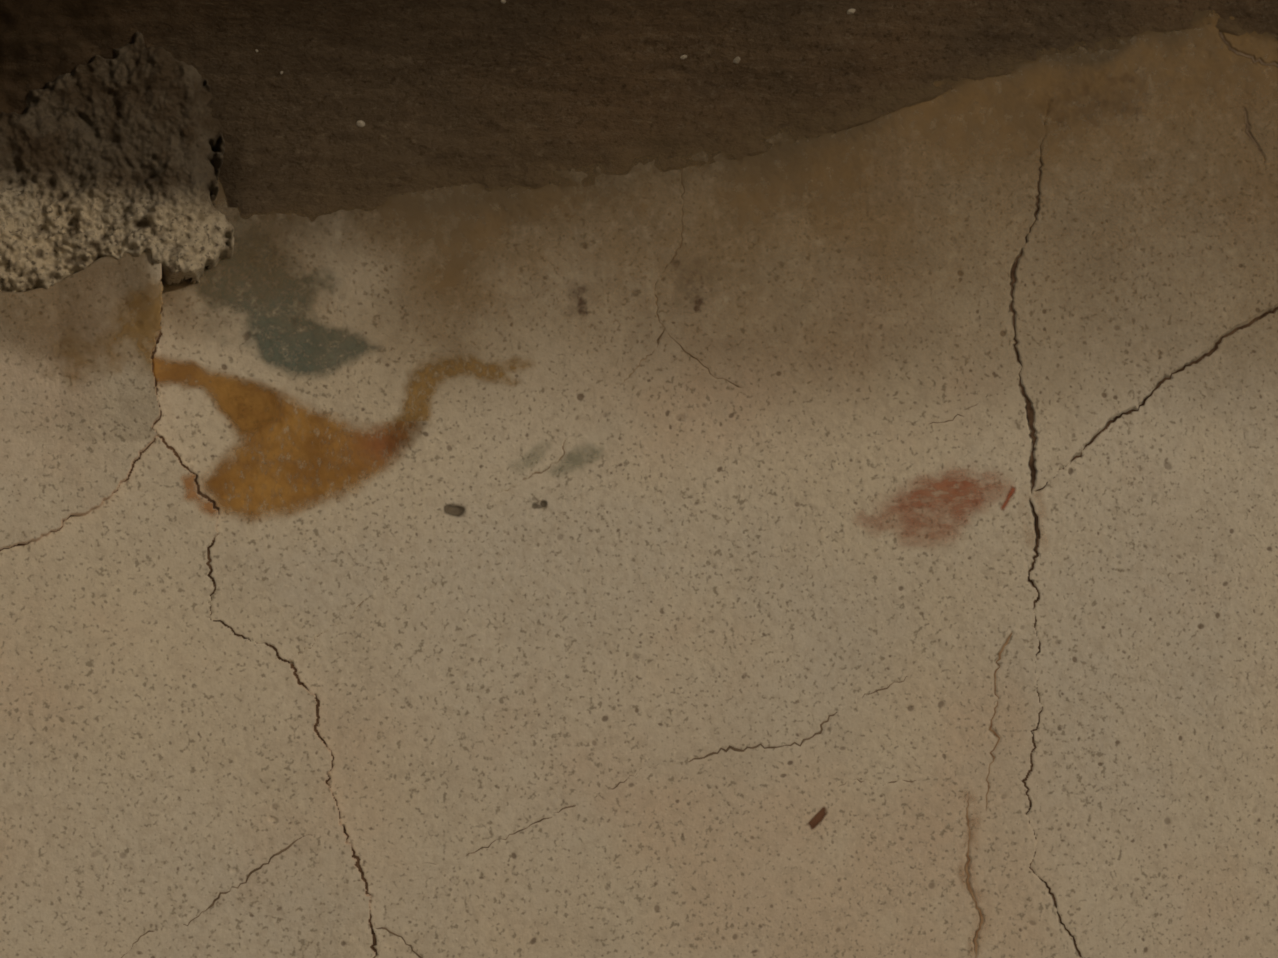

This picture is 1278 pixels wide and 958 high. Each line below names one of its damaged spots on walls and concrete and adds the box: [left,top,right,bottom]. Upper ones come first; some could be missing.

spalling [0,32,234,292]
crack [0,515,76,551]
crack [113,307,422,958]
crack [466,765,657,856]
crack [688,676,908,762]
crack [914,147,1278,958]